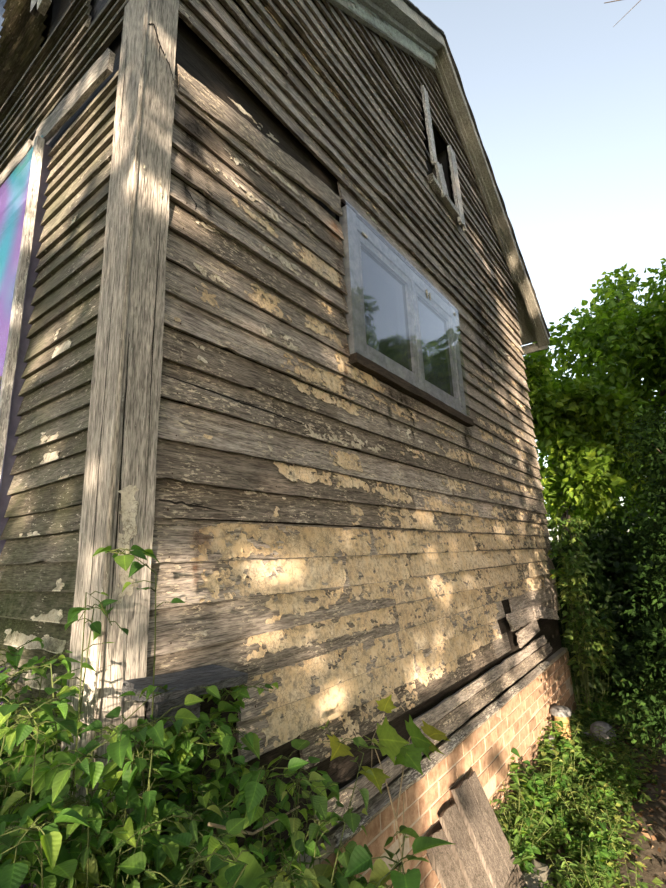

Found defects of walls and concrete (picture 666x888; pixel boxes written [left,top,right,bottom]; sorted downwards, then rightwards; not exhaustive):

peeling [228,97,279,142]
peeling [224,148,305,200]
peeling [203,164,283,238]
peeling [193,263,230,308]
peeling [251,241,342,288]
peeling [52,328,72,358]
peeling [40,432,60,464]
peeling [190,283,550,758]
peeling [116,485,139,604]